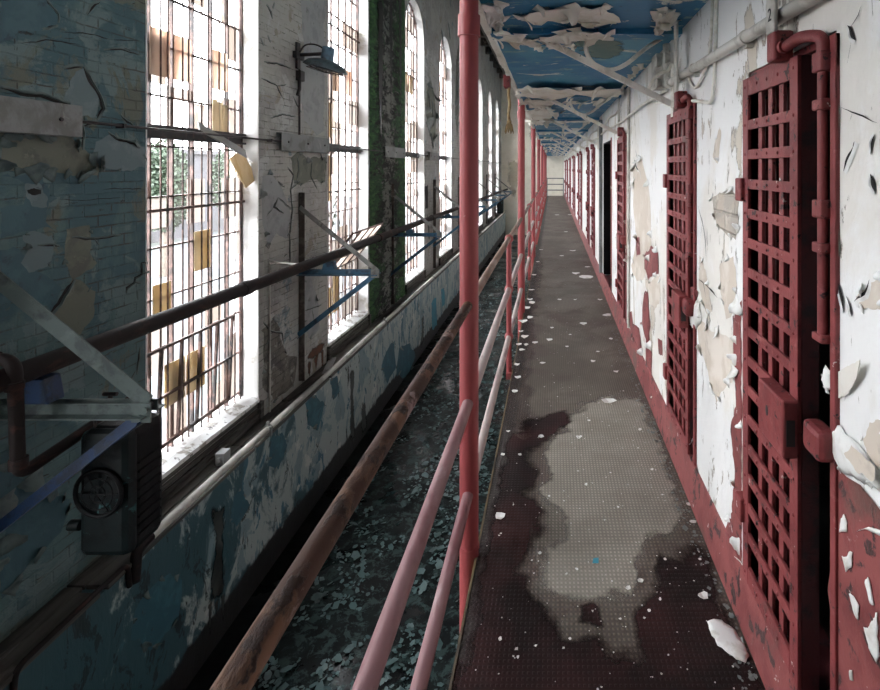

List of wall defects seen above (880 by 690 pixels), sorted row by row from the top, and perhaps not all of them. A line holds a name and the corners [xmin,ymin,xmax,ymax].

peeling [481,0,621,53]
crack [24,0,140,150]
peeling [515,63,646,153]
peeling [0,133,147,208]
peeling [260,169,292,249]
flaking render [709,186,740,241]
peeling [623,155,663,375]
flaking render [261,314,297,403]
corrosion [308,343,325,376]
peeling [689,254,743,564]
leakage [451,410,765,690]
peeling [828,419,880,690]